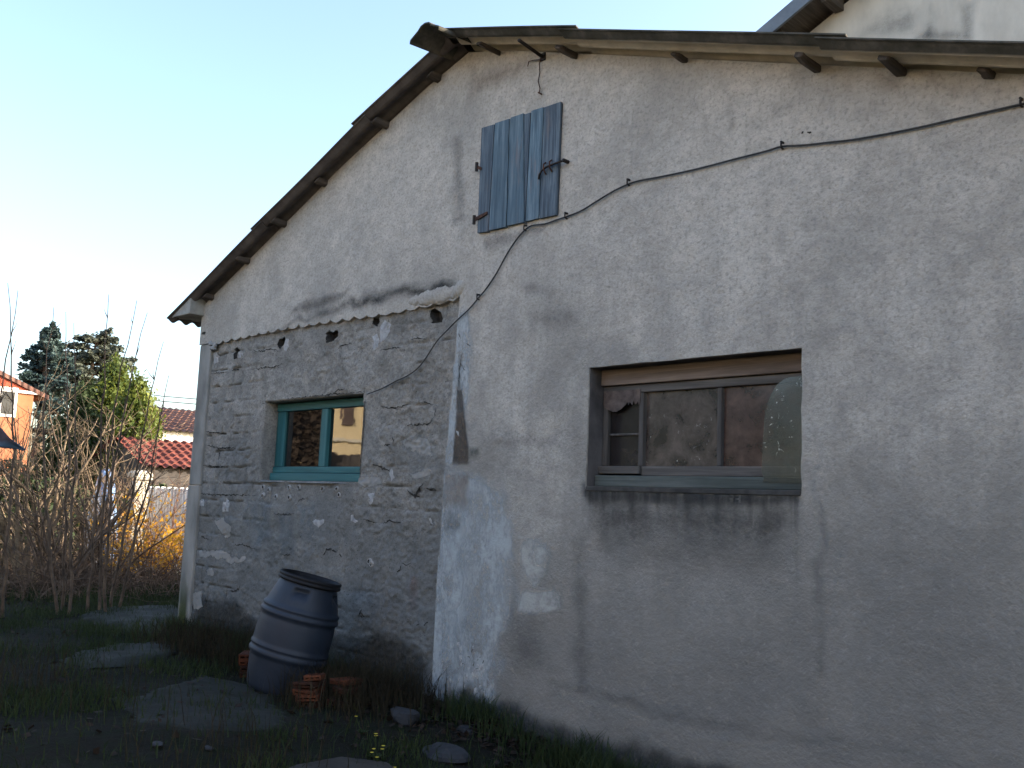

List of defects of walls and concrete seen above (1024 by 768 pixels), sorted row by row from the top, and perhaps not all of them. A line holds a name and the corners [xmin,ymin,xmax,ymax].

spalling [276,335,289,351]
spalling [324,327,340,345]
spalling [372,315,391,350]
crack [211,348,282,374]
crack [203,431,235,468]
peeling [428,306,560,700]
damp [584,489,794,526]
peeling [199,498,246,576]
peeling [193,590,203,610]